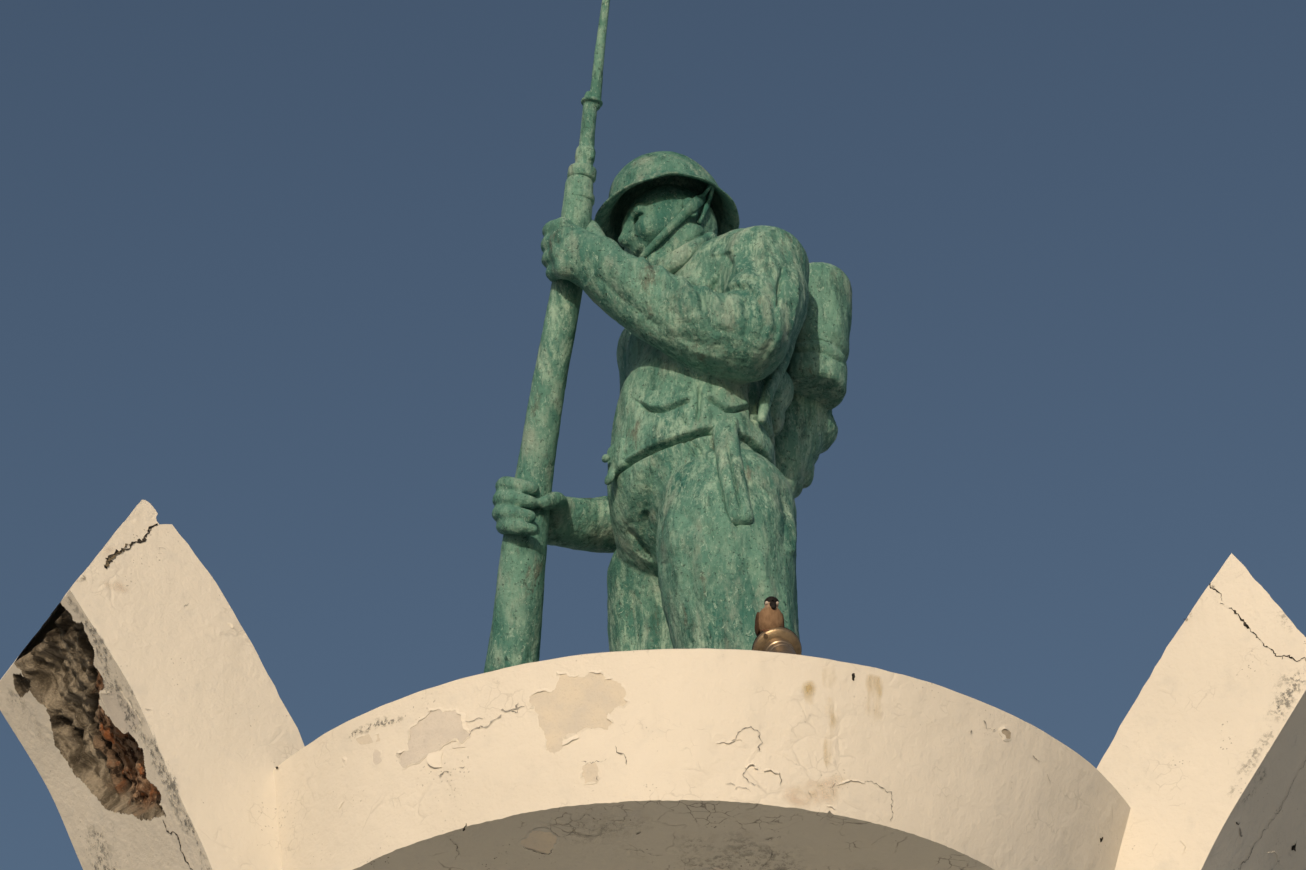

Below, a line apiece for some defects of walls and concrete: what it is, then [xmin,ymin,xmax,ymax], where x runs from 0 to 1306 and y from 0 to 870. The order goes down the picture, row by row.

crack [104,523,158,569]
crack [1209,583,1306,662]
spalling [13,600,166,821]
peeling [354,707,471,777]
peeling [526,670,630,755]